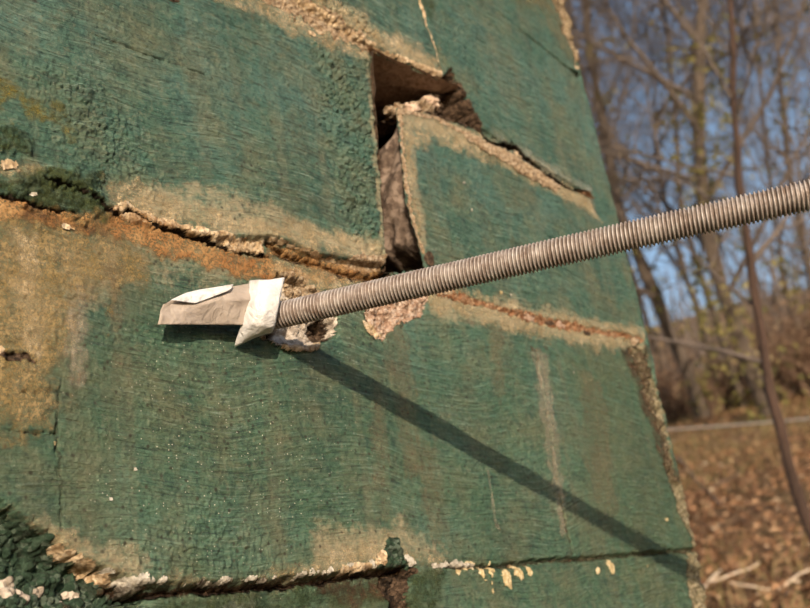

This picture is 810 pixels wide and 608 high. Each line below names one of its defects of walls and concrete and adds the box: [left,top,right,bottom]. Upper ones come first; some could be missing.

peeling [263,0,443,78]
crack [465,131,594,200]
crack [0,177,391,282]
spalling [274,271,319,301]
spalling [260,317,338,353]
spalling [363,289,706,608]
crack [457,514,693,570]
crack [97,562,404,604]
peeling [183,550,418,608]